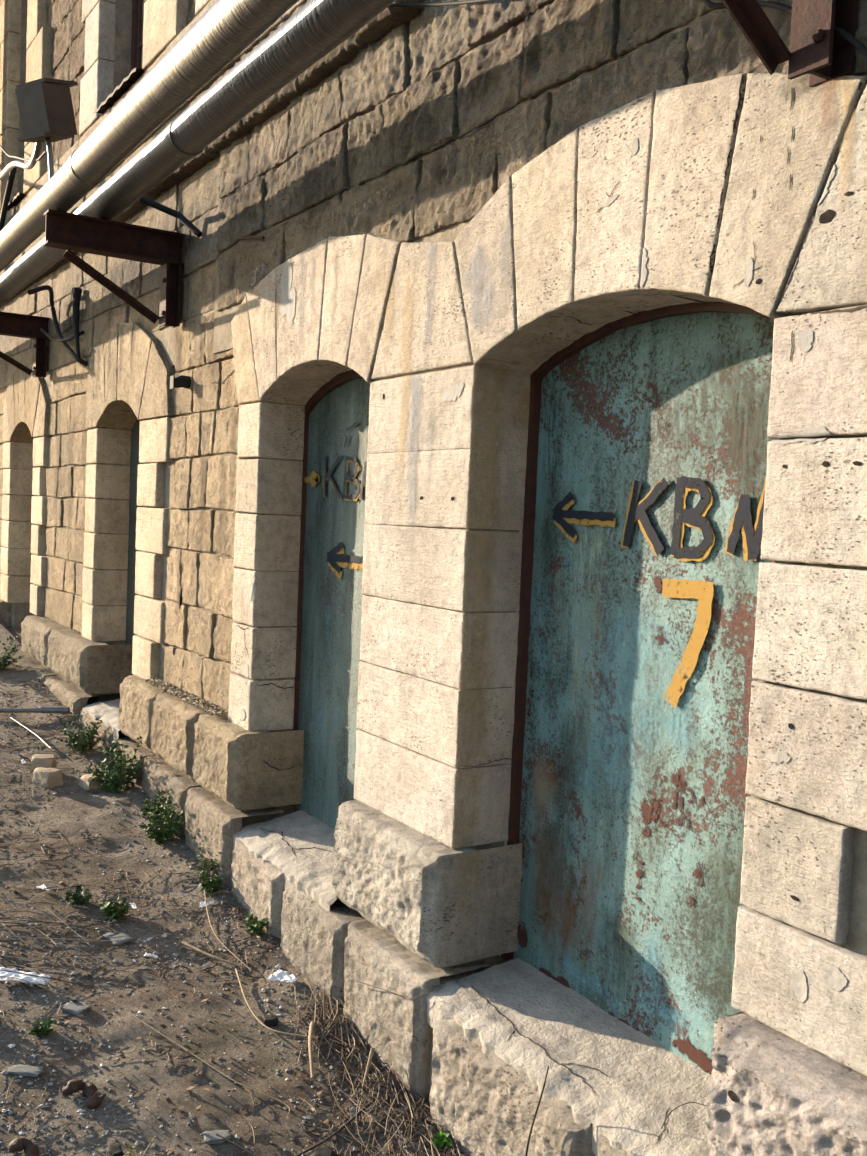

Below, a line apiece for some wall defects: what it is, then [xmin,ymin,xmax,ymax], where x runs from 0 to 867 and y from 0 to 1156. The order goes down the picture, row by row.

crack [261,828,333,857]
crack [472,986,610,1096]